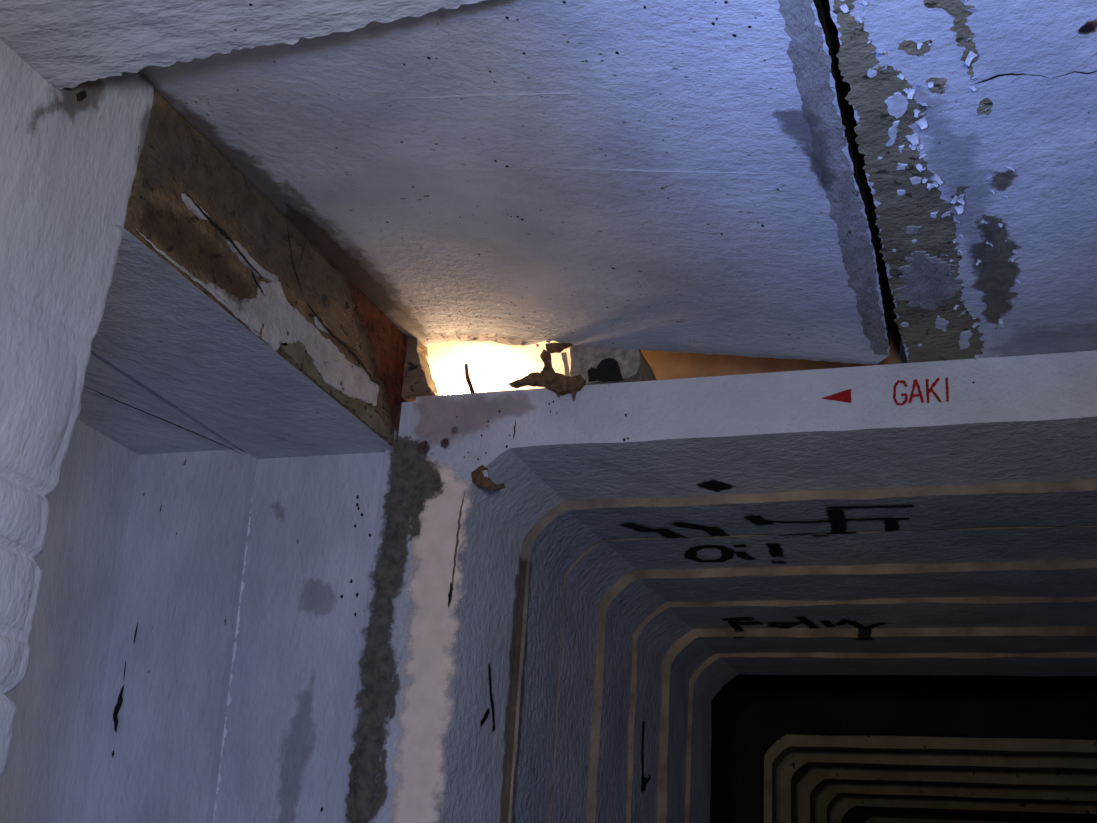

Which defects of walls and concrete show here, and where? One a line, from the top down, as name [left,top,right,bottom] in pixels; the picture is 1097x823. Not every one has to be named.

crack [972,71,1097,85]
peeling [181,194,210,220]
peeling [640,0,1022,380]
peeling [137,230,392,438]
water stain [345,435,443,823]